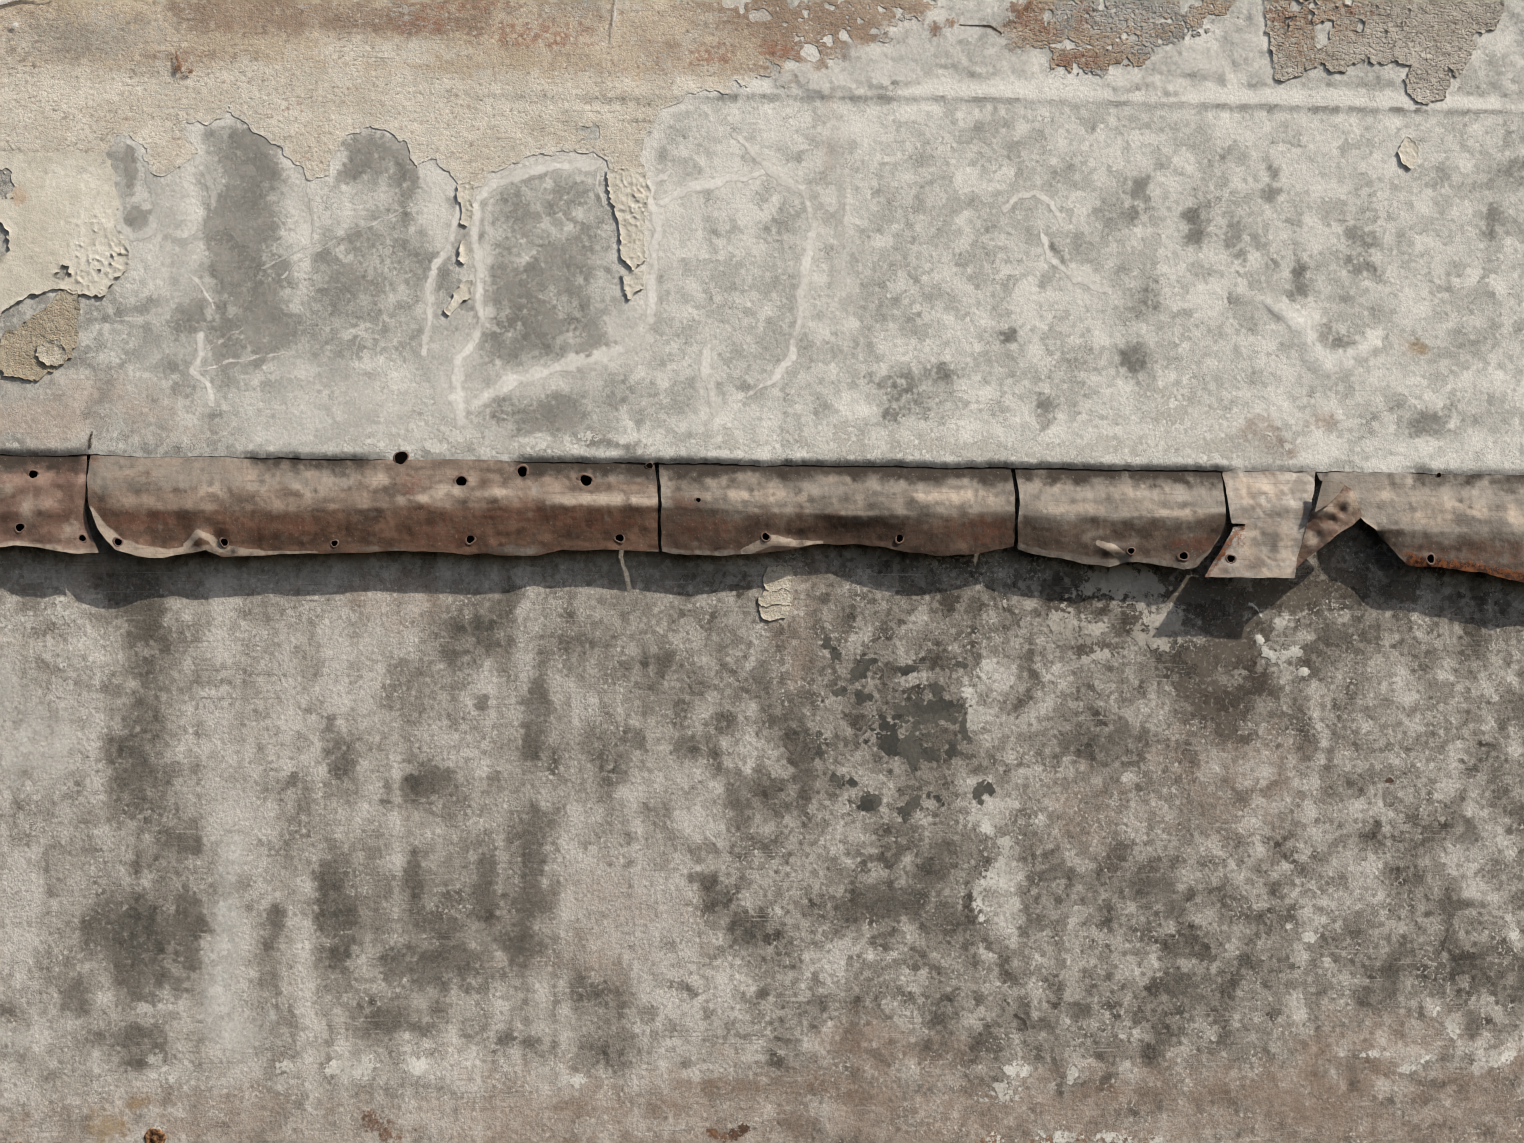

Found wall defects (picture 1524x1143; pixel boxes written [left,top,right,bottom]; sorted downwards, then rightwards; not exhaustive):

peeling [995,0,1239,78]
peeling [1264,0,1505,105]
peeling [0,0,945,381]
water stain [521,674,553,759]
water stain [958,658,993,737]
water stain [1034,563,1424,746]
water stain [473,802,551,968]
water stain [836,806,1046,936]
water stain [82,832,261,1050]
water stain [318,1052,439,1083]
water stain [1347,1047,1435,1090]
water stain [1431,992,1518,1068]